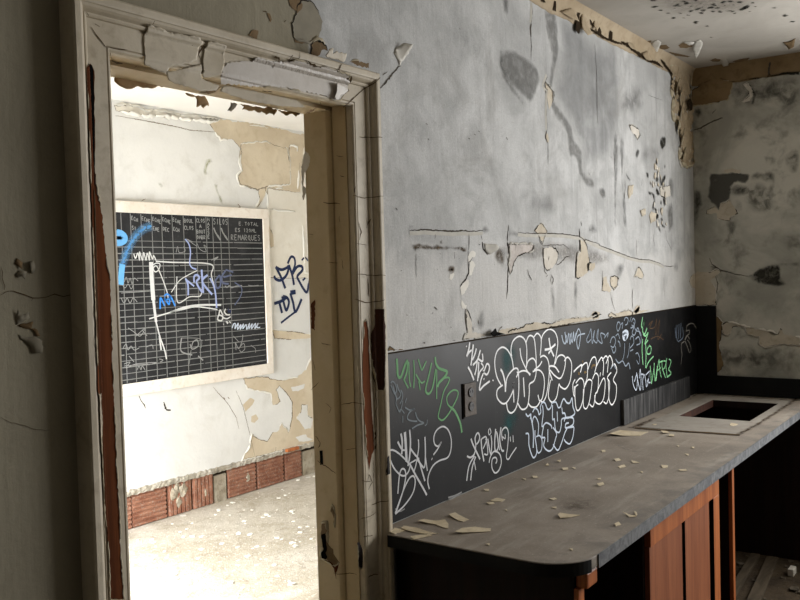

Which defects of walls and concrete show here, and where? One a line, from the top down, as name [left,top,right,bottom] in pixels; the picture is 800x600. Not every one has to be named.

peeling [562,8,599,35]
damp [674,0,756,27]
peeling [143,0,369,116]
peeling [627,40,733,169]
peeling [641,158,671,232]
crack [1,268,69,299]
peeling [508,223,559,273]
peeling [576,236,595,279]
crack [506,224,672,299]
damp [754,265,783,285]
peeling [16,310,43,353]
peeling [87,63,315,600]